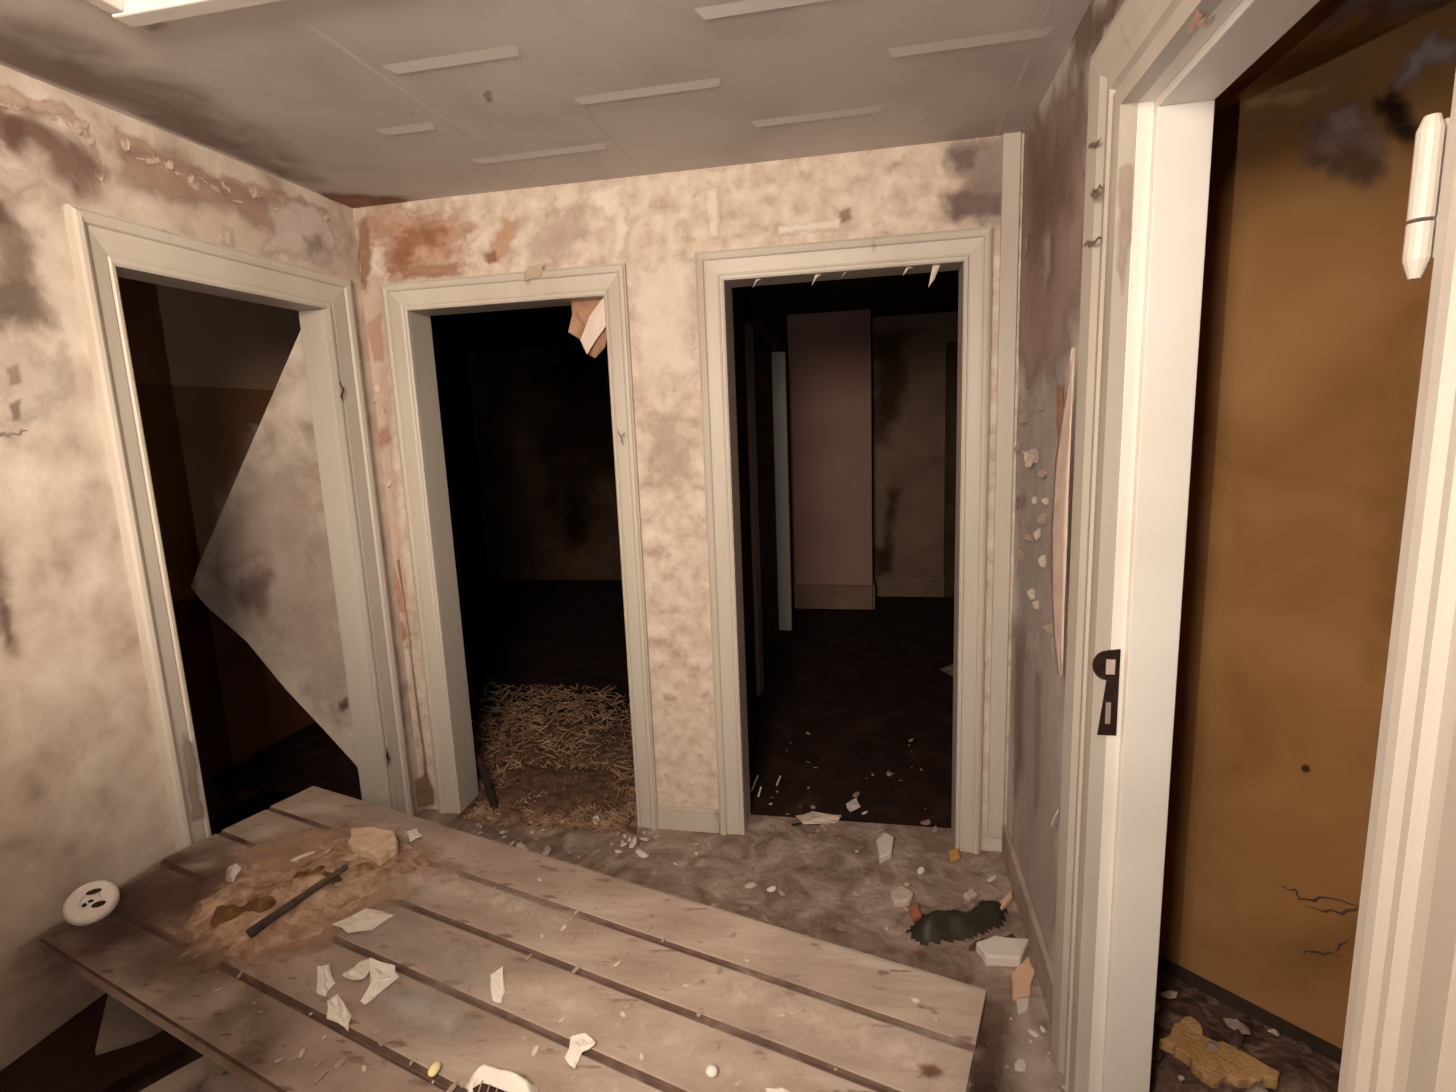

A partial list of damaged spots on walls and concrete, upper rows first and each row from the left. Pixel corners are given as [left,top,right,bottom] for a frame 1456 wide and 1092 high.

leakage [1251,34,1383,83]
leakage [0,111,96,193]
peeling [0,86,105,181]
peeling [115,129,336,265]
leakage [1376,93,1416,140]
leakage [0,202,38,319]
peeling [1014,347,1075,676]